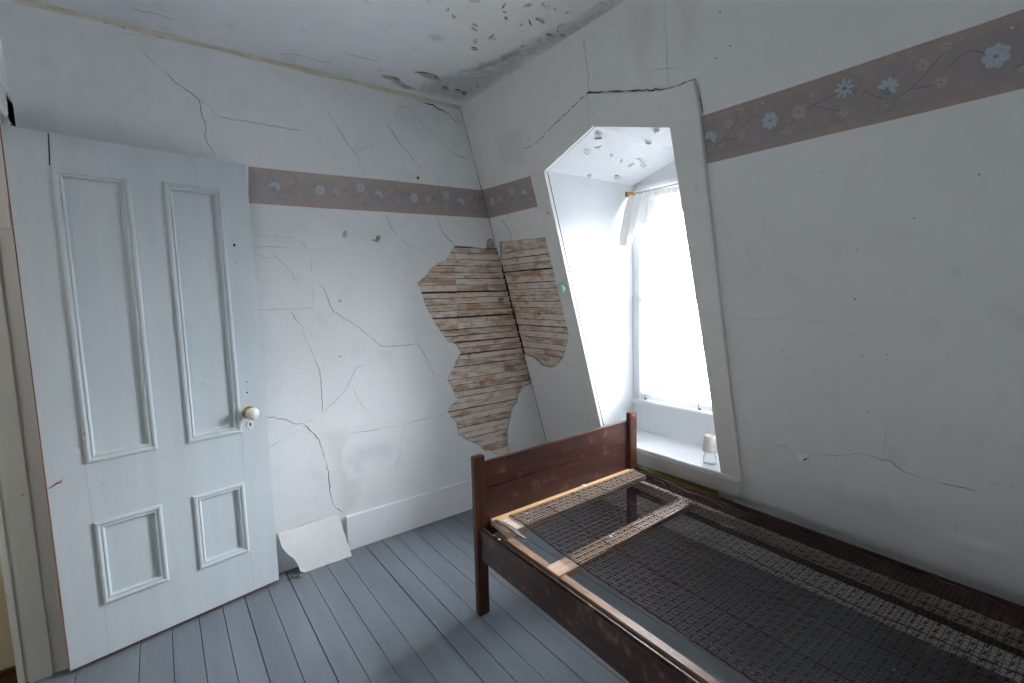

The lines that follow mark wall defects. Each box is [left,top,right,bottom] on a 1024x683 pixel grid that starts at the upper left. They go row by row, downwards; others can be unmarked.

damp [411,0,624,105]
peeling [429,0,607,70]
crack [147,56,511,241]
peeling [550,128,675,185]
crack [258,235,444,512]